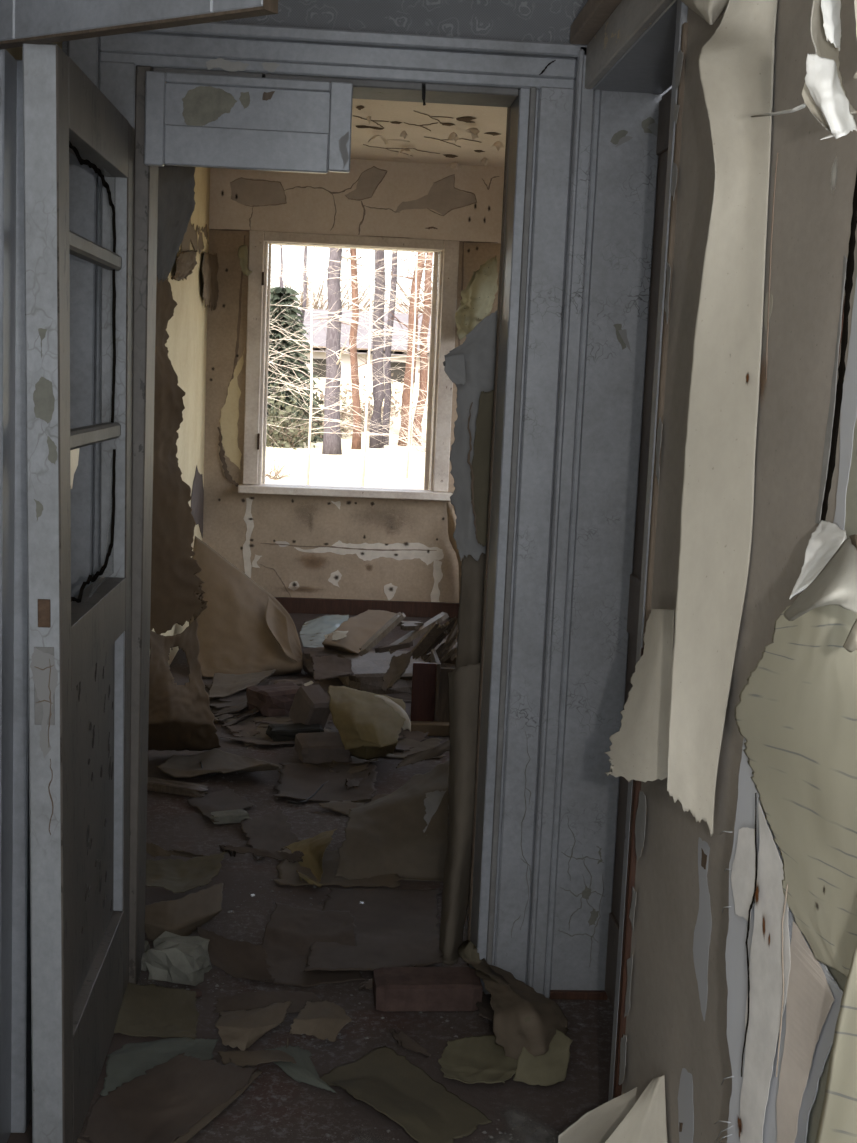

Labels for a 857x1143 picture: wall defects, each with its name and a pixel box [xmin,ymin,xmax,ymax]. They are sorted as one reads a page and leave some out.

peeling [206,58,280,72]
peeling [182,86,275,126]
peeling [230,177,287,207]
peeling [339,105,408,168]
crack [353,110,479,156]
peeling [395,117,504,216]
crack [284,173,498,305]
peeling [191,466,204,538]
peeling [243,498,444,602]
peeling [635,791,646,861]
peeling [678,1068,694,1143]